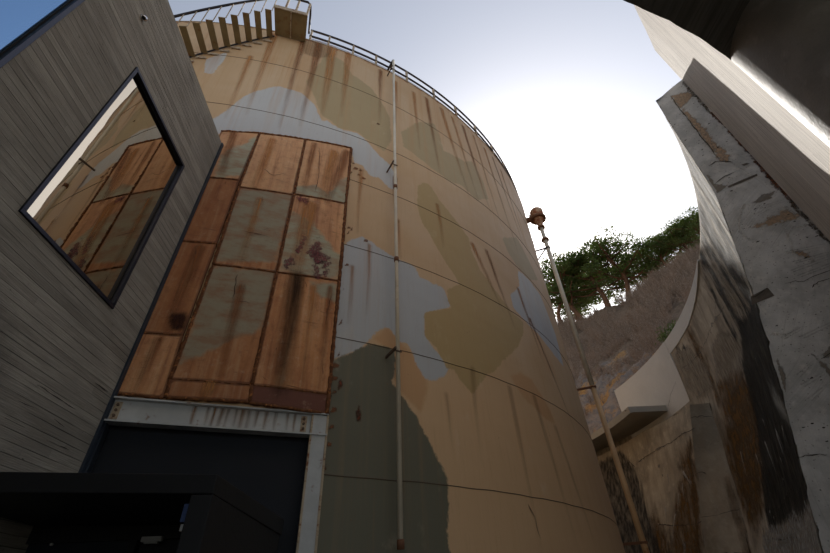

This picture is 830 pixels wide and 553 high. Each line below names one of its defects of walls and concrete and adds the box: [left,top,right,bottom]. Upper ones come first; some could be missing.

rust [310,43,335,77]
rust [281,273,303,362]
damp [665,117,822,553]
damp [599,440,705,553]